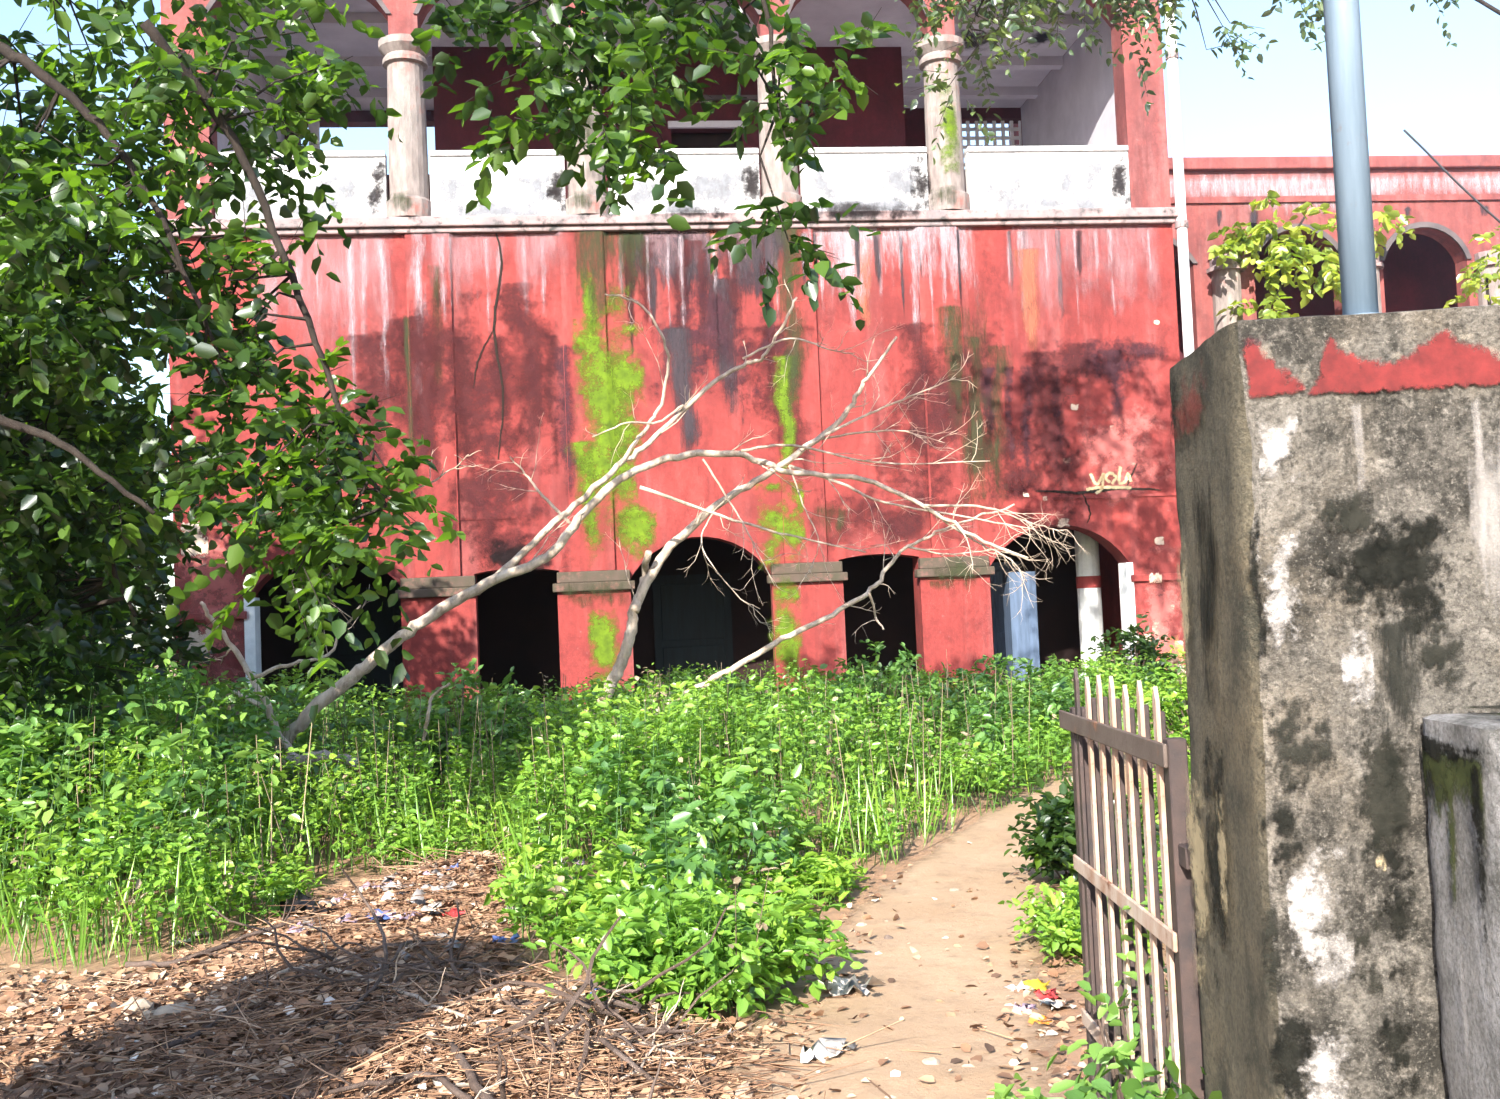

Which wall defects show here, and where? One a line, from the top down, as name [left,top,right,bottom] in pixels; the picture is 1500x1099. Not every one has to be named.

water stain [436,163,566,216]
water stain [325,241,576,555]
water stain [620,156,1164,544]
water stain [1167,374,1182,443]
peeling [1243,329,1500,398]
water stain [1192,483,1218,700]
water stain [1248,514,1266,656]
water stain [1203,738,1228,946]
water stain [1259,674,1337,879]
water stain [1316,491,1466,1099]
water stain [1261,902,1283,988]
water stain [1270,1016,1312,1099]